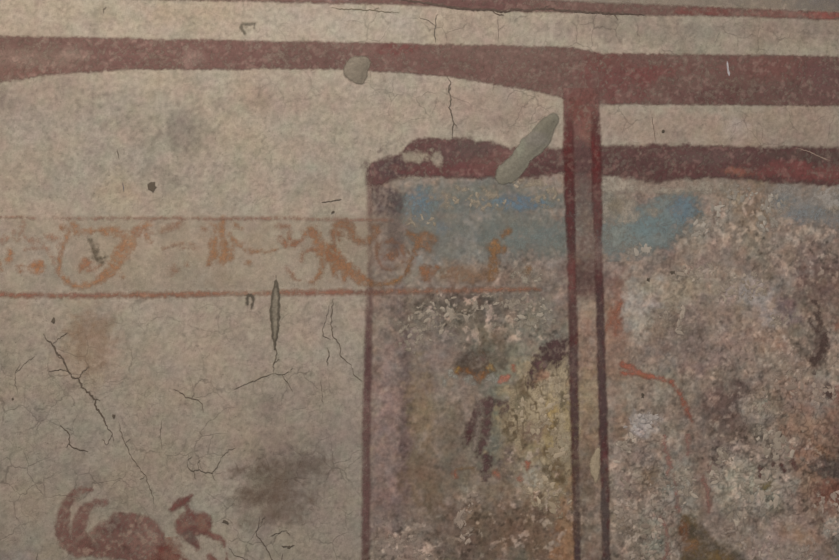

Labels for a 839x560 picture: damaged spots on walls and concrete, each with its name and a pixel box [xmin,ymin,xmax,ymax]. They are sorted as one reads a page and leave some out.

crack [331,0,642,43]
crack [447,75,458,137]
spalling [269,280,280,350]
crack [236,346,293,392]
crack [320,300,360,402]
crack [44,332,154,501]
crack [187,448,234,480]
crack [256,517,294,560]